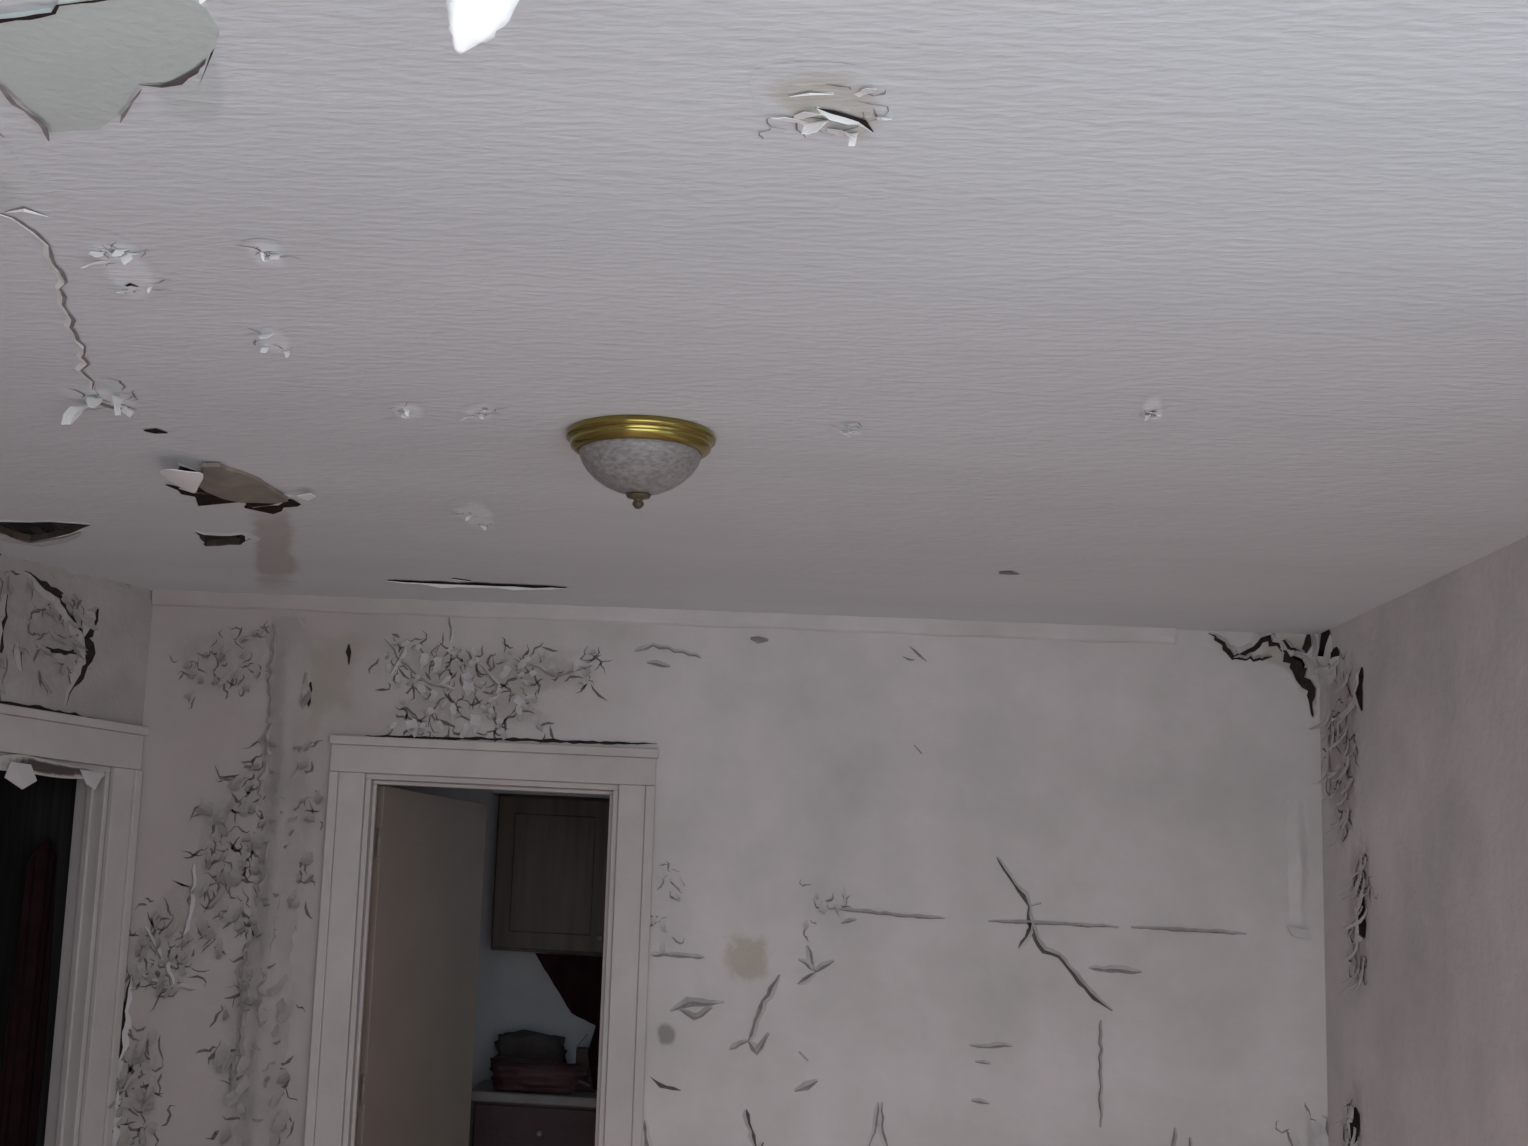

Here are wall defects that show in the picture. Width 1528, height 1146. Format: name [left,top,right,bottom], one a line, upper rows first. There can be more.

spalling [750,61,896,150]
crack [0,206,95,389]
crack [0,553,99,719]
crack [1208,629,1363,717]
crack [829,907,945,924]
crack [1353,897,1366,944]
crack [111,864,197,1146]
crack [670,945,834,1092]
crack [988,856,1247,1128]
crack [643,1077,681,1146]
crack [742,1109,764,1146]
crack [1345,1102,1360,1144]